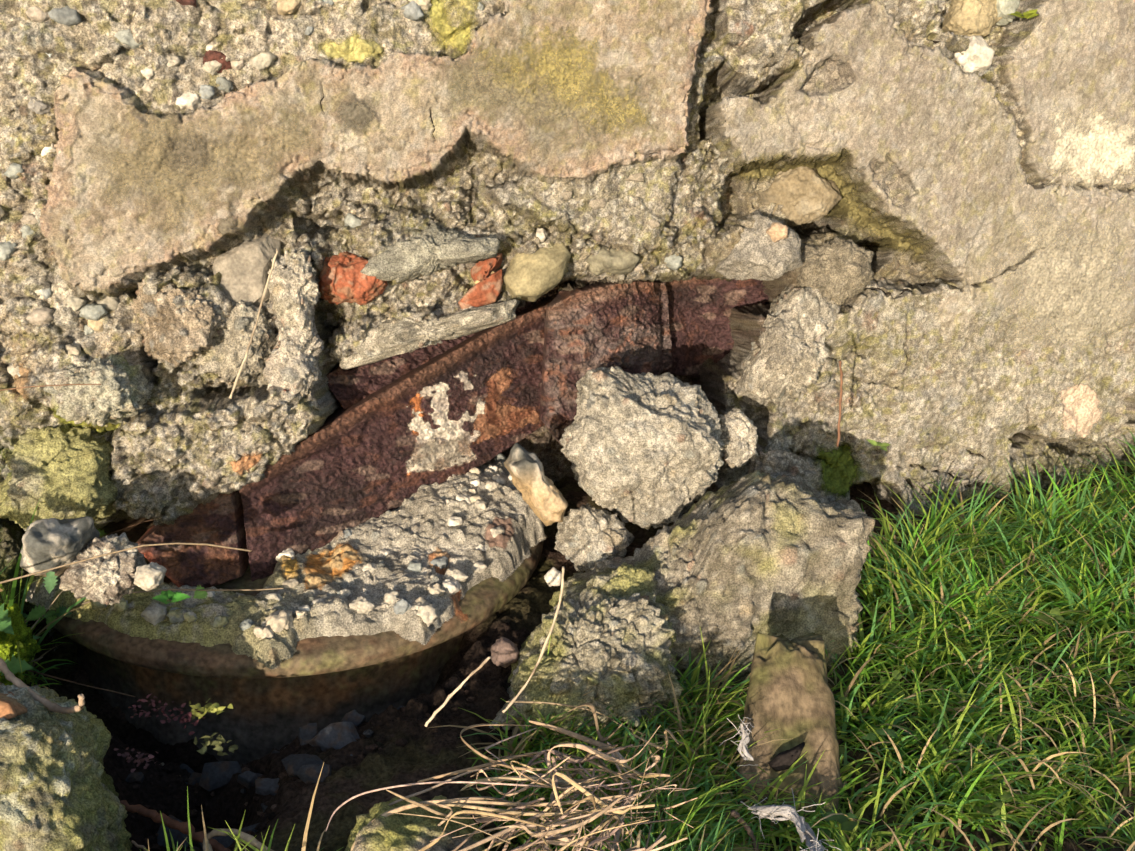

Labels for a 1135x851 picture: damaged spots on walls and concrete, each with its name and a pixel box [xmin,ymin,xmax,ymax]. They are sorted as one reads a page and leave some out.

spalling [0,0,1045,448]
rust [410,386,426,417]
rust [473,368,539,444]
rust [230,454,261,475]
spalling [492,425,575,483]
rust [485,517,514,549]
rust [281,544,362,589]
rust [429,549,449,575]